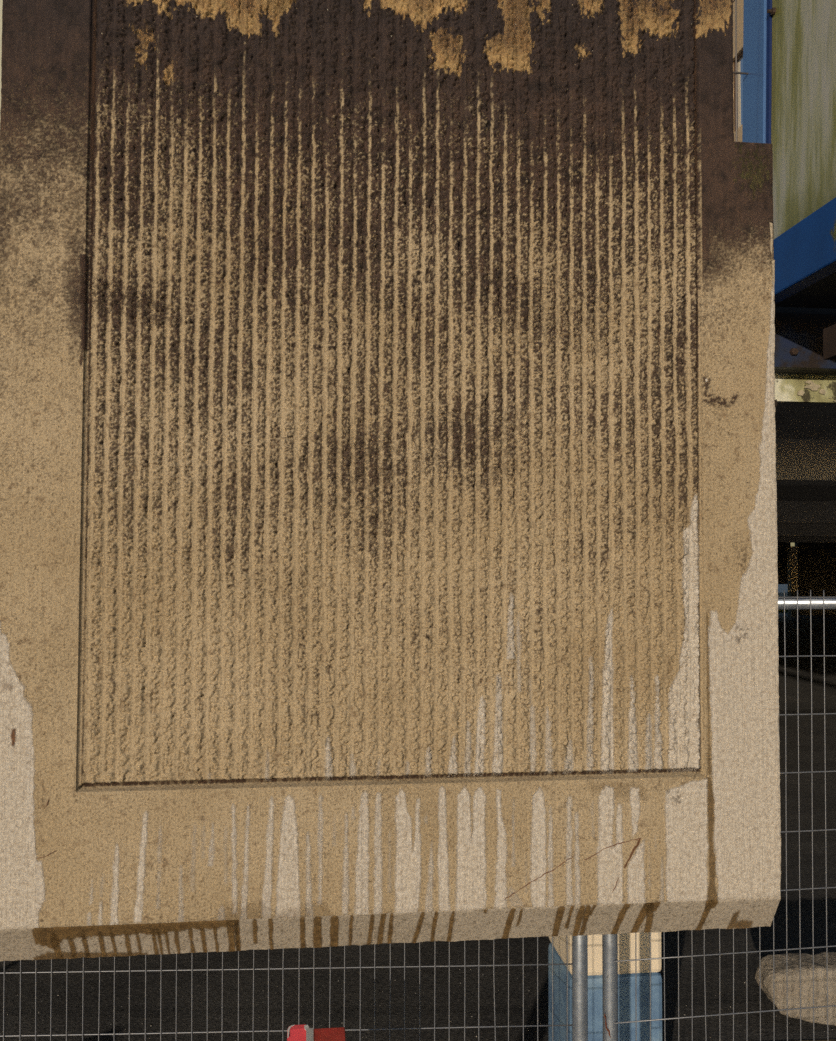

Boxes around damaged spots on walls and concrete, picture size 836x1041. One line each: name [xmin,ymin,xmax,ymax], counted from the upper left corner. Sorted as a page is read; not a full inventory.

damp [132,26,156,69]
damp [163,64,173,86]
damp [126,0,296,38]
damp [364,0,467,77]
damp [483,0,550,74]
damp [579,0,604,18]
damp [617,0,684,58]
damp [696,0,732,38]
damp [79,254,89,365]
damp [0,280,781,960]